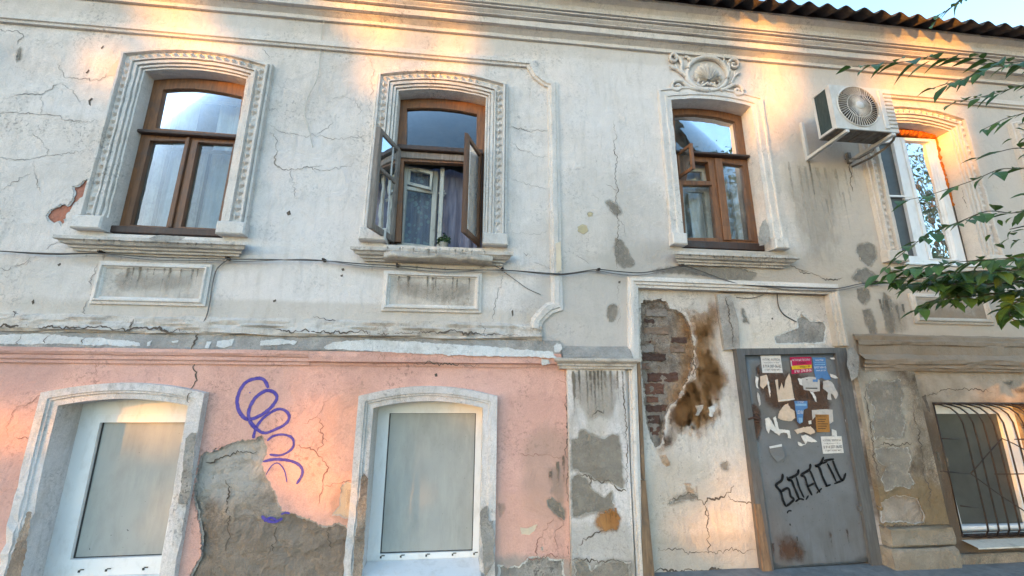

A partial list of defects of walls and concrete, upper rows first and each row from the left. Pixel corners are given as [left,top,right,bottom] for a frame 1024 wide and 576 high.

crack [0,67,107,190]
crack [271,56,374,198]
spalling [46,179,87,227]
crack [0,266,198,403]
spalling [178,433,368,576]
crack [296,400,351,503]
peeling [324,339,562,366]
spalling [547,429,625,520]
damp [572,370,624,399]
flaking render [640,299,694,447]
crack [655,486,751,572]
flaking render [847,347,925,524]